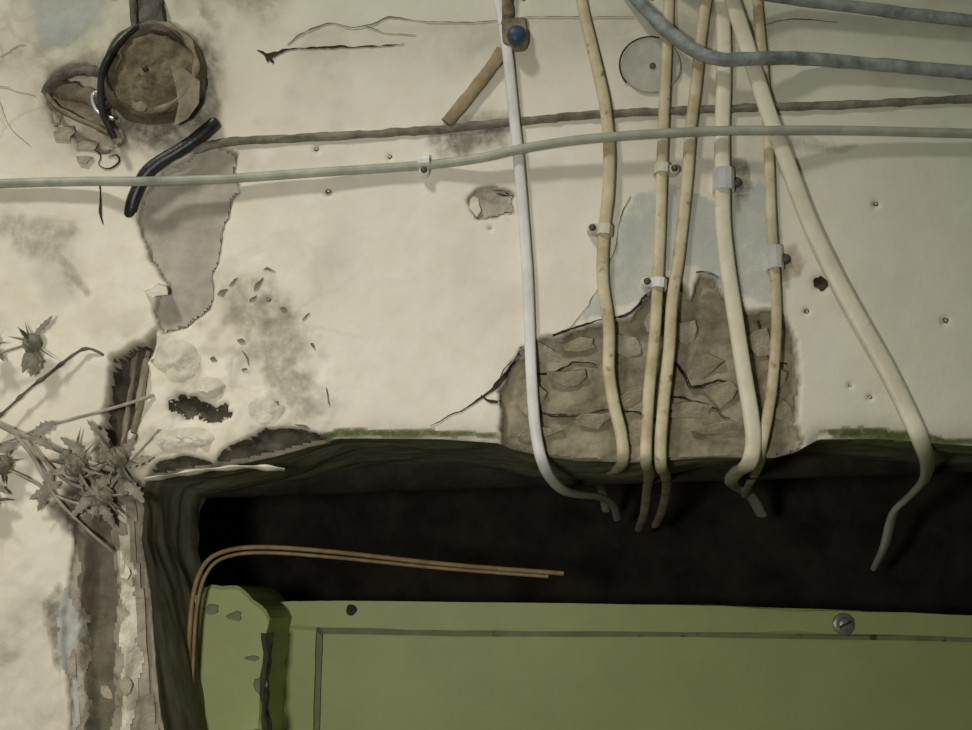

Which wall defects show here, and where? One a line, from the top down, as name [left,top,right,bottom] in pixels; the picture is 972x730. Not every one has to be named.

flaking render [49,63,98,89]
crack [257,16,495,63]
crack [518,13,634,21]
flaking render [46,95,125,165]
flaking render [138,148,239,333]
flaking render [469,186,513,219]
spalling [105,346,155,448]
spalling [168,394,232,423]
flaking render [501,291,617,459]
flaking render [608,193,745,460]
flaking render [743,312,802,456]
flaking render [57,424,323,730]